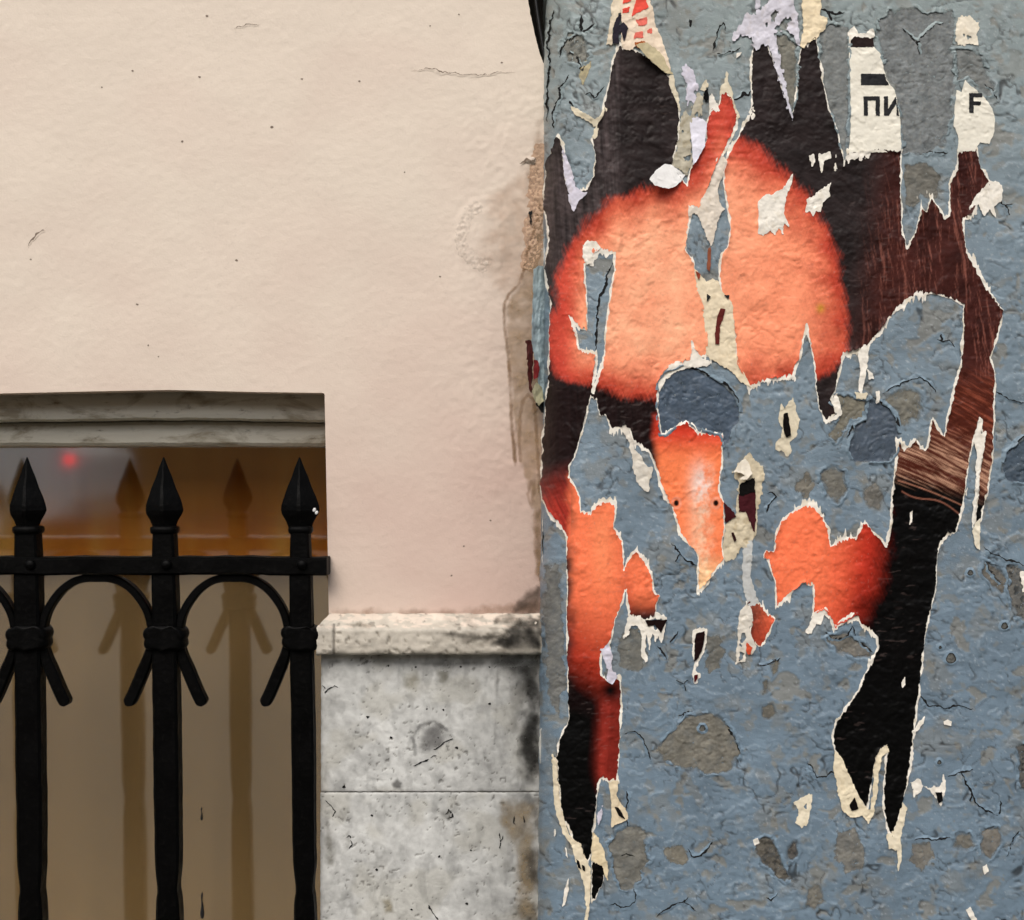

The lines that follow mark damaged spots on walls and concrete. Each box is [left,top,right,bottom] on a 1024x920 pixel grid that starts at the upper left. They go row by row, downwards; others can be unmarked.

crack [412,67,515,79]
crack [543,10,605,128]
peeling [774,29,801,114]
peeling [817,20,854,150]
peeling [874,4,999,207]
leakage [508,357,541,521]
peeling [655,365,743,450]
peeling [795,389,921,510]
crack [657,632,693,720]
leakage [522,715,539,770]
crack [945,765,1002,816]
crack [609,888,695,916]